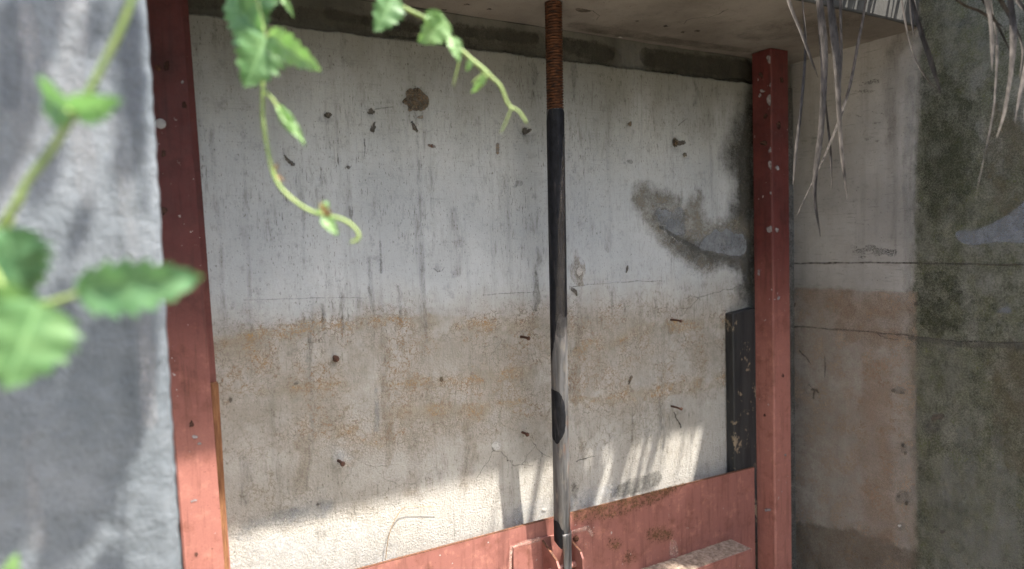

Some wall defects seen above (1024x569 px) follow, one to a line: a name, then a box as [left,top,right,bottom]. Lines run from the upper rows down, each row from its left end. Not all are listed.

leakage [267,5,420,39]
leakage [439,24,546,57]
leakage [633,38,755,302]
leakage [955,201,1024,245]
rust [216,304,548,452]
rust [567,303,726,414]